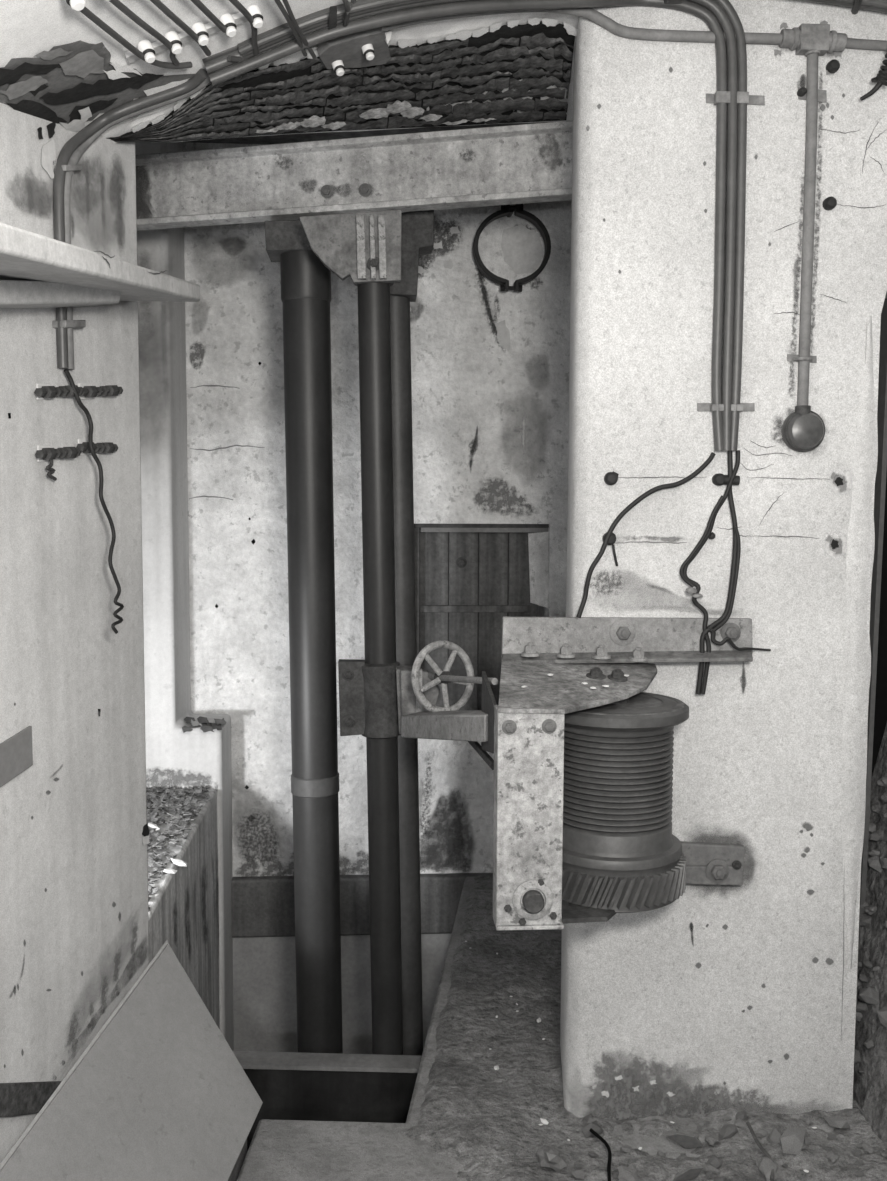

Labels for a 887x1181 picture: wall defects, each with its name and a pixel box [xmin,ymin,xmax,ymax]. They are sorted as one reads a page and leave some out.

spalling [0,40,195,179]
spalling [106,18,578,142]
damp [15,178,50,216]
damp [77,162,125,236]
corrosion [789,102,822,392]
damp [474,479,533,515]
crack [618,473,704,481]
crack [718,441,830,539]
damp [240,814,277,861]
damp [800,823,813,857]
damp [68,927,147,1049]
damp [587,1053,769,1120]